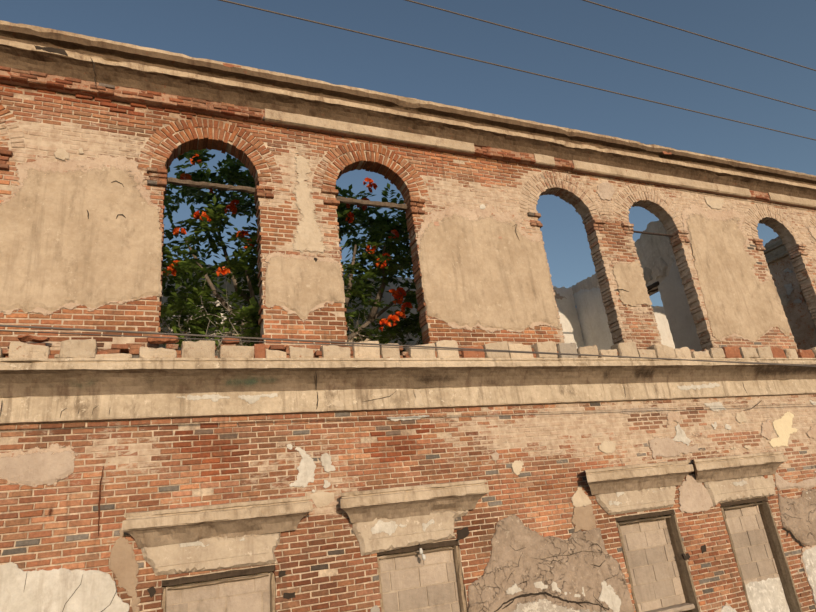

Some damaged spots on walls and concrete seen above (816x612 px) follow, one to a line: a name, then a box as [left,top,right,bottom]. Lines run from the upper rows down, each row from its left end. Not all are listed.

peeling [620,402,816,475]
peeling [0,443,78,487]
peeling [287,444,338,493]
peeling [0,562,167,612]
crack [494,592,609,612]
spalling [678,513,790,612]
spalling [784,538,816,612]